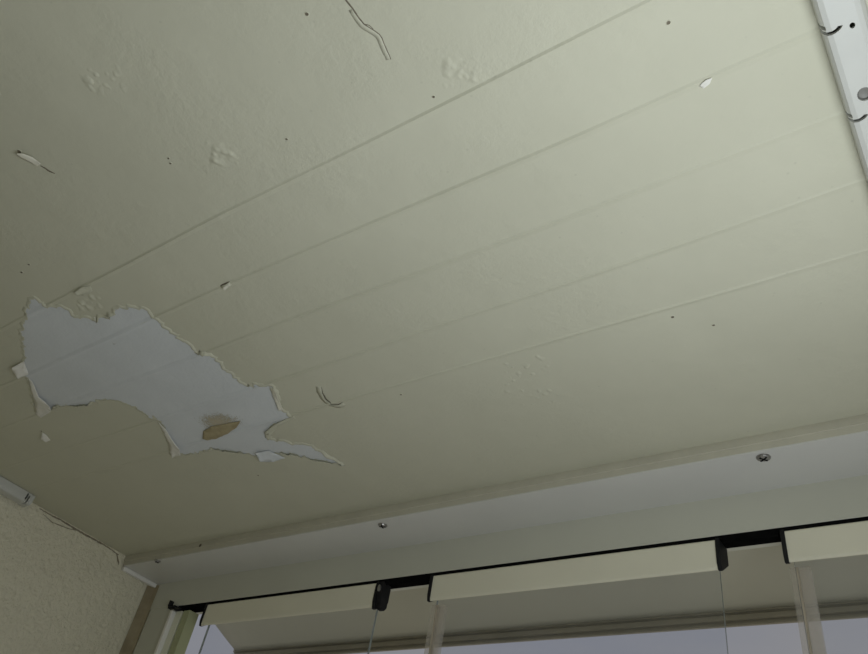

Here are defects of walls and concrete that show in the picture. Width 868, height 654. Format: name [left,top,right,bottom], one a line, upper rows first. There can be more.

crack [345,0,391,60]
peeling [11,295,345,466]